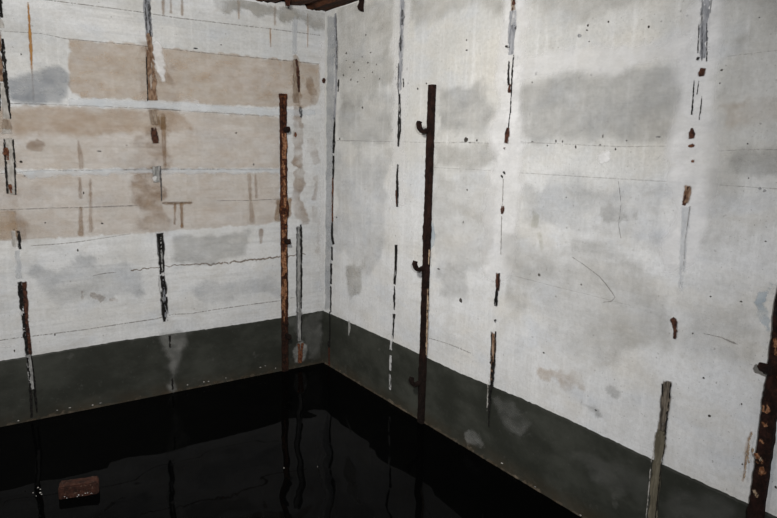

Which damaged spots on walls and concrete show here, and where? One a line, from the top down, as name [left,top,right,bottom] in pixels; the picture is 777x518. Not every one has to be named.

leakage [9,71,66,102]
rust [146,33,158,101]
crack [0,0,315,119]
crack [2,139,47,210]
crack [63,167,278,204]
crack [327,13,339,366]
crack [0,224,306,418]
leakage [0,311,749,518]